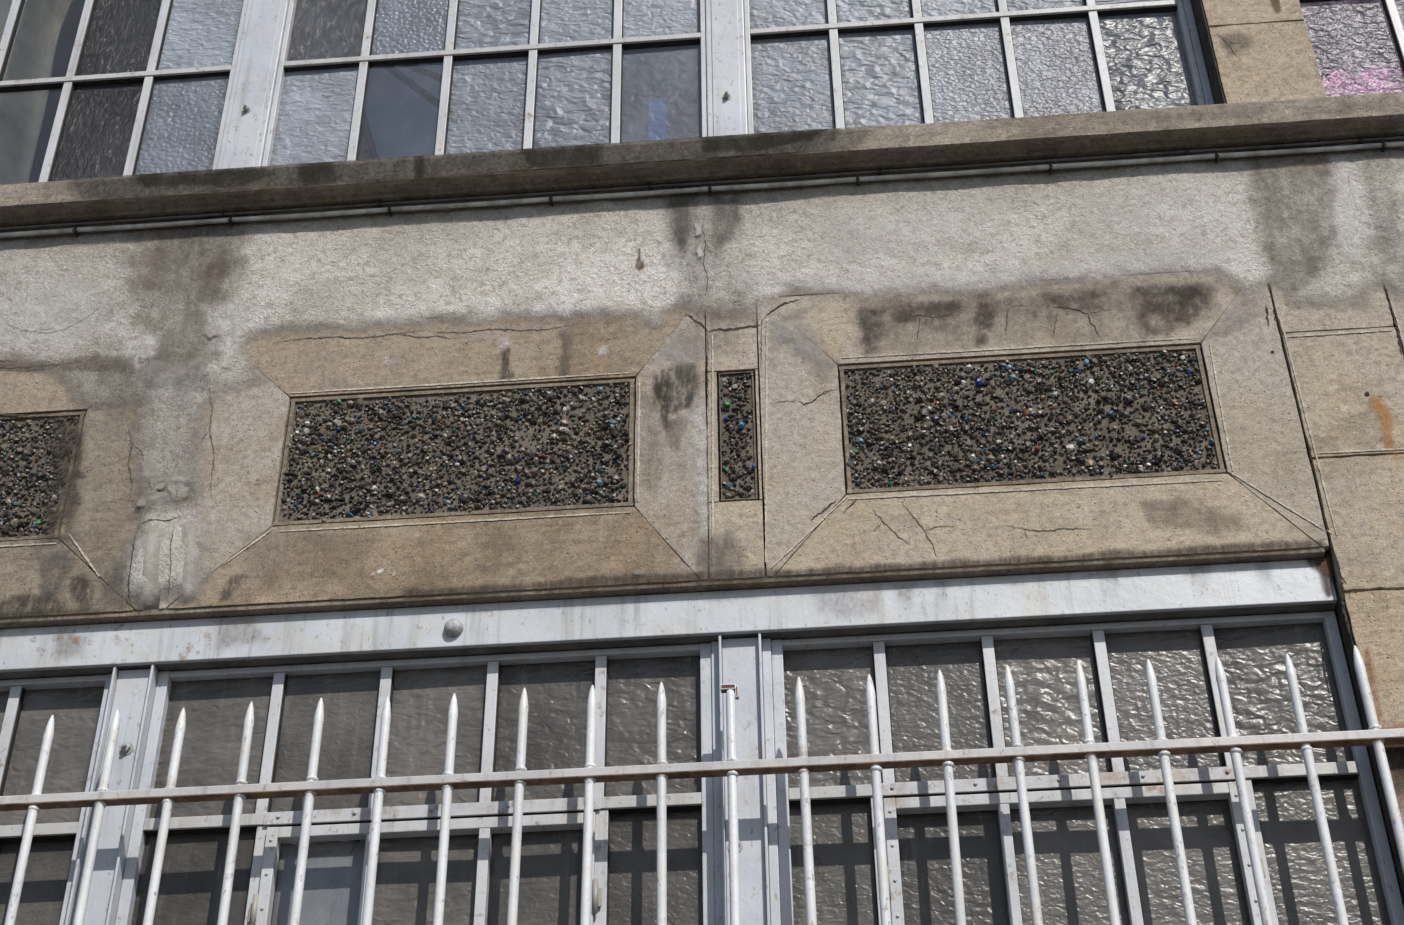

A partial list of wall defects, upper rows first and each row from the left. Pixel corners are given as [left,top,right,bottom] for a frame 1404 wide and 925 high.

leakage [143,217,237,380]
leakage [655,365,696,427]
crack [811,499,955,557]